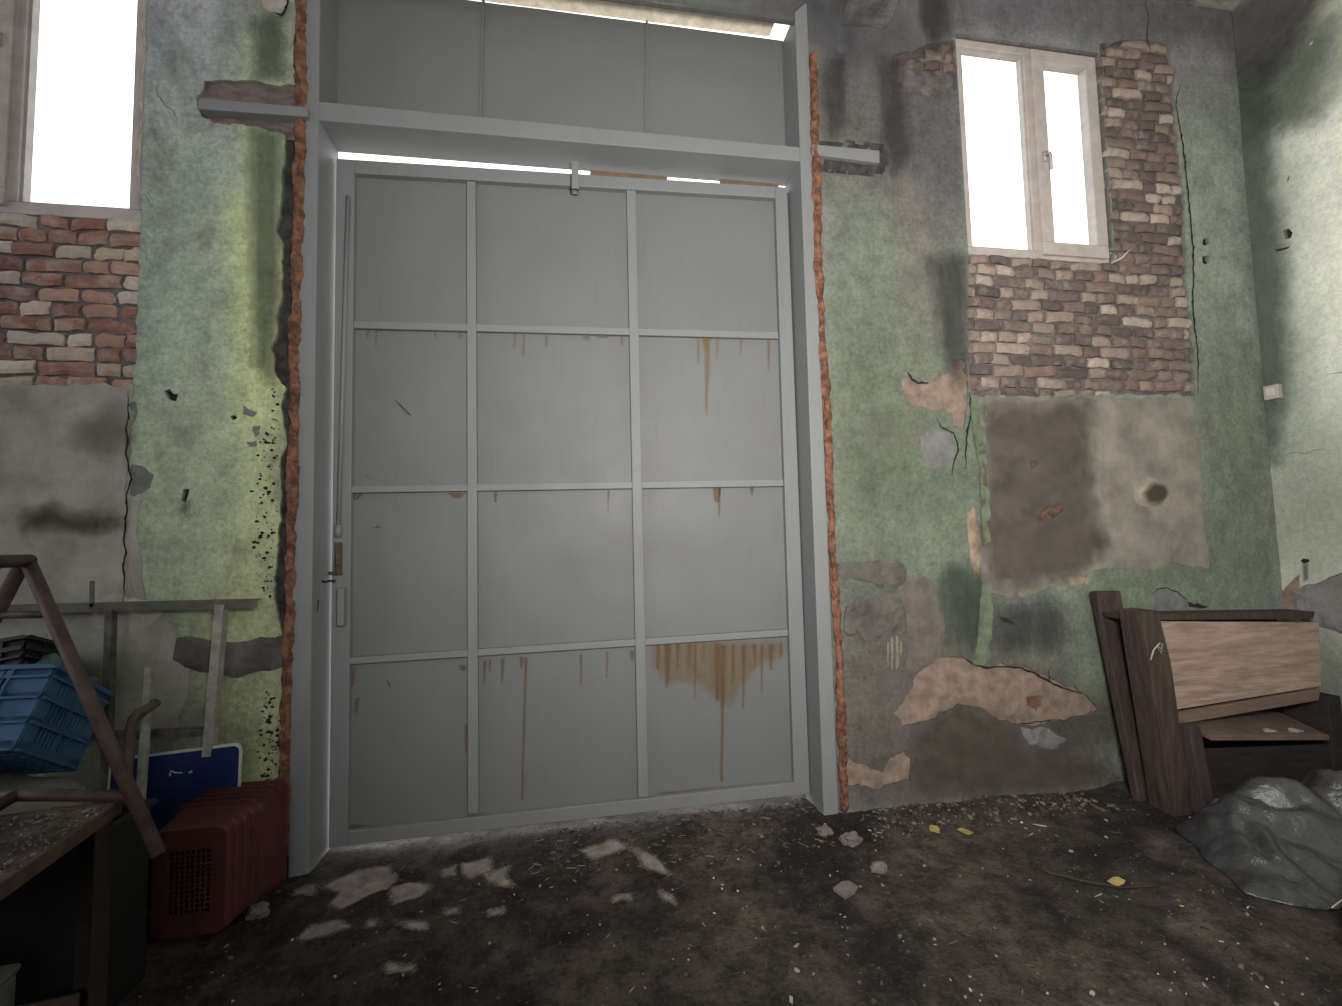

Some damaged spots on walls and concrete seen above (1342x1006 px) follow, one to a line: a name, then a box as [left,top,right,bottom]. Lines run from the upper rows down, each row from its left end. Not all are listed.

spalling [261,0,289,16]
spalling [0,212,141,387]
spalling [891,40,1195,749]
damp [26,508,113,529]
crack [122,397,132,602]
peeling [1282,558,1309,622]
corrosion [657,644,781,794]
peeling [847,752,910,790]